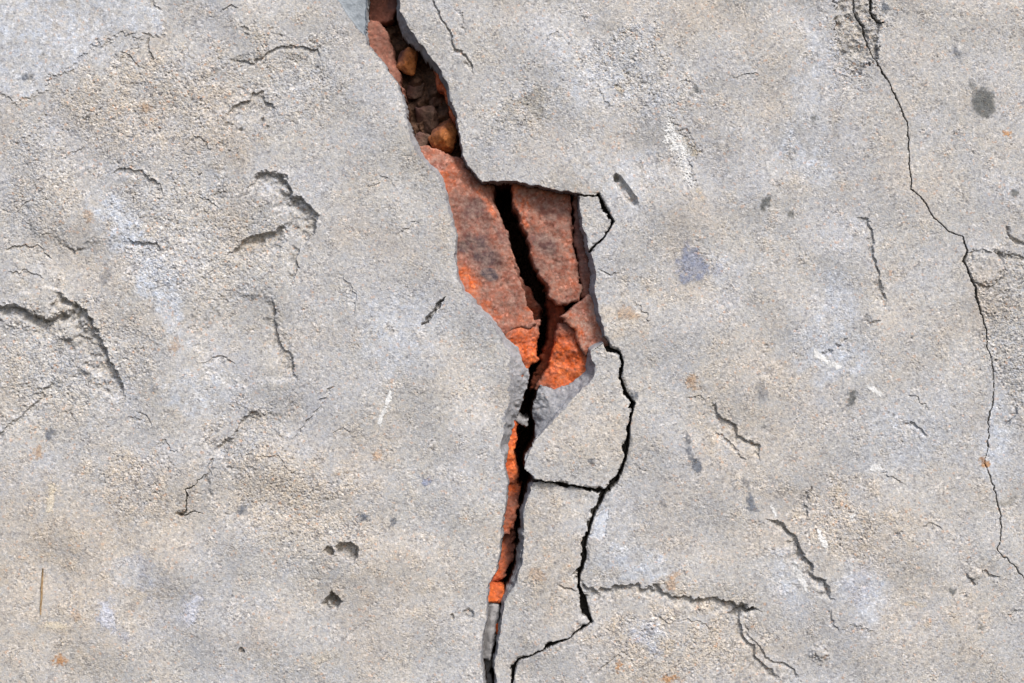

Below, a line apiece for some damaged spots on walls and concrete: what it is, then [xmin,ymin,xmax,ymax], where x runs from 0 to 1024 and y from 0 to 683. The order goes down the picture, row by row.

crack [338,0,635,683]
peeling [589,506,611,540]
crack [852,0,1024,577]